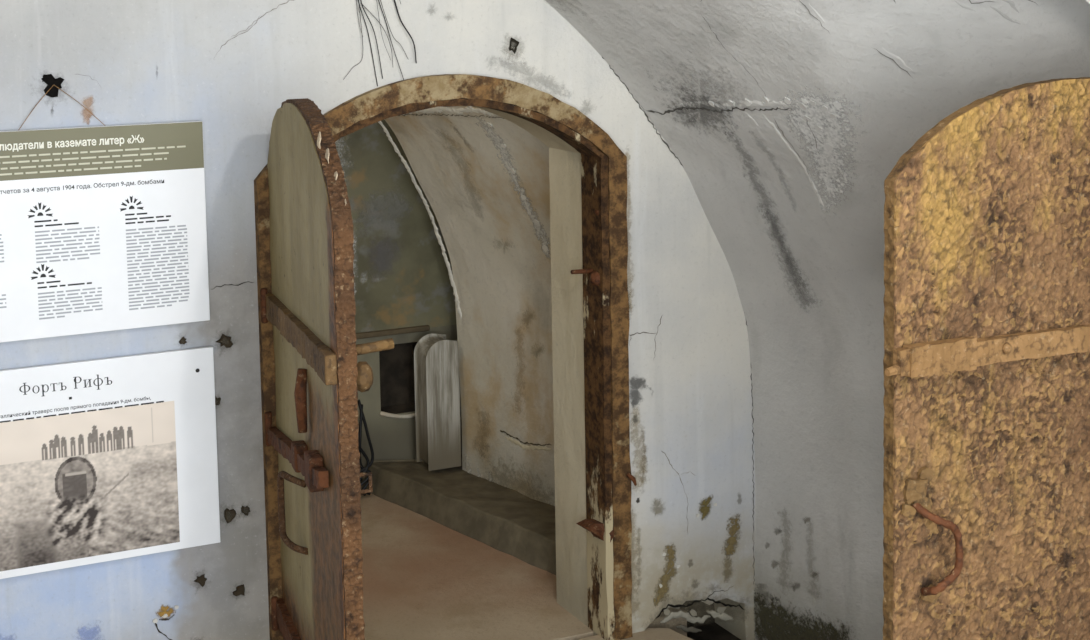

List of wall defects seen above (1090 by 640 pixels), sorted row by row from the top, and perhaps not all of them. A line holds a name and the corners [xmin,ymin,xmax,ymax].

crack [218,0,294,52]
crack [801,2,829,32]
crack [876,47,913,75]
peeling [696,496,717,520]
peeling [724,515,740,556]
spalling [653,545,744,633]
water stain [754,593,849,640]